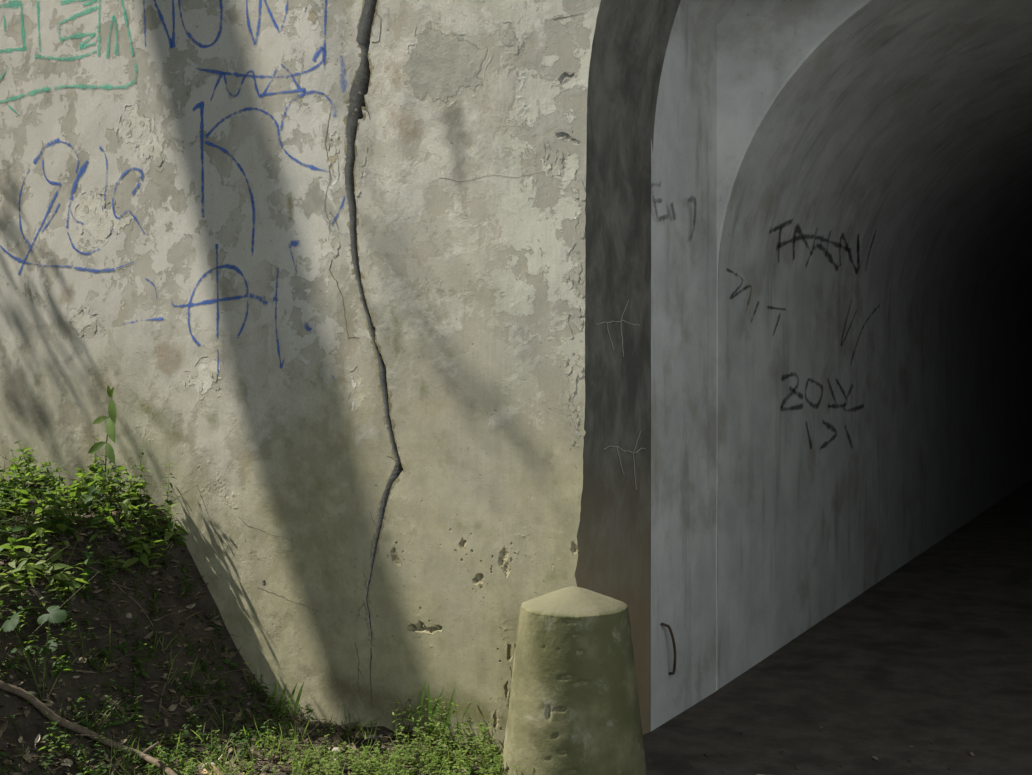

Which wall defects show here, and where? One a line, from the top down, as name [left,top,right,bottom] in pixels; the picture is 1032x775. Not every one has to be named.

peeling [402,18,540,128]
spalling [558,61,575,85]
peeling [116,99,168,173]
peeling [354,139,372,197]
peeling [74,186,136,248]
peeling [541,127,586,448]
peeling [66,304,99,339]
peeling [181,354,224,400]
crack [325,0,406,709]
spalling [449,528,518,599]
spalling [407,606,442,639]